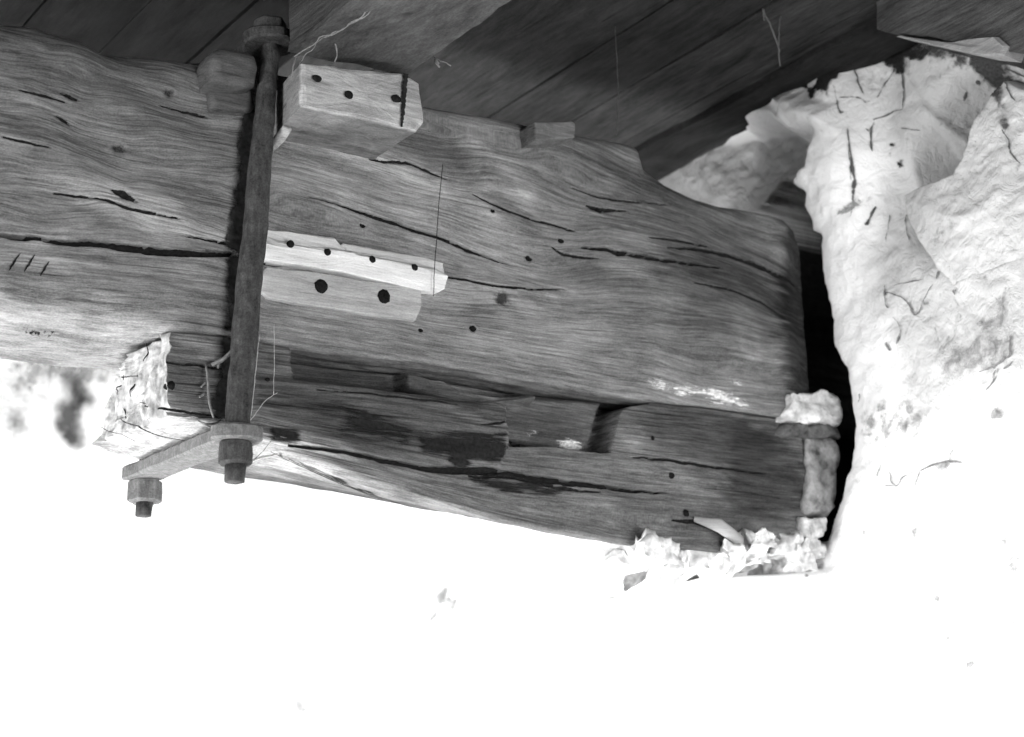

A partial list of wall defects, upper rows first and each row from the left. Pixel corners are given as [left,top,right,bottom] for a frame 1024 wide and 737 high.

crack [19,90,78,125]
crack [161,106,205,118]
crack [7,190,231,257]
crack [313,198,559,291]
crack [573,188,665,213]
crack [472,194,797,319]
leakage [339,408,561,496]
crack [272,420,666,505]
crack [633,457,763,474]